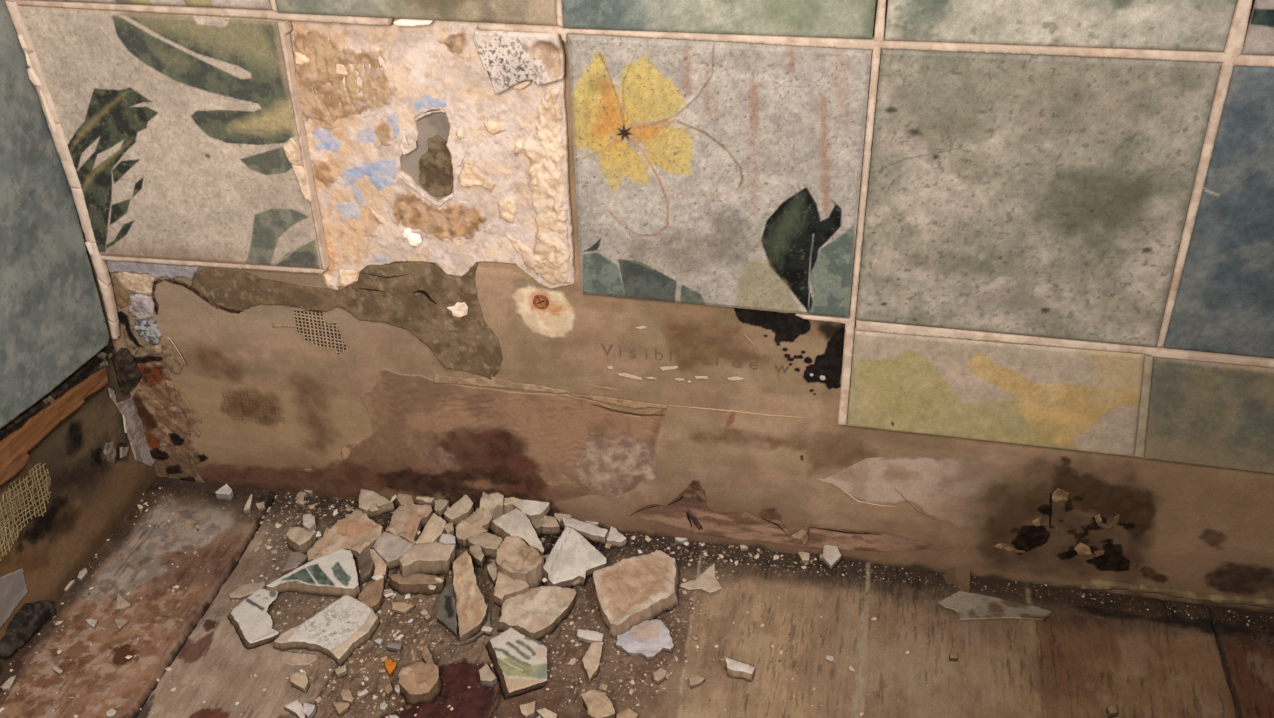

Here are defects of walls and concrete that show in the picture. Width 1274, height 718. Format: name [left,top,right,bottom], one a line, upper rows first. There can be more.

flaking render [85,18,666,503]
water stain [668,308,845,395]
water stain [200,430,656,517]
peeling [816,457,981,527]
water stain [987,458,1166,583]
peeling [0,569,28,628]
peeling [65,568,97,592]
water stain [1207,564,1274,594]
peeling [1,675,17,692]